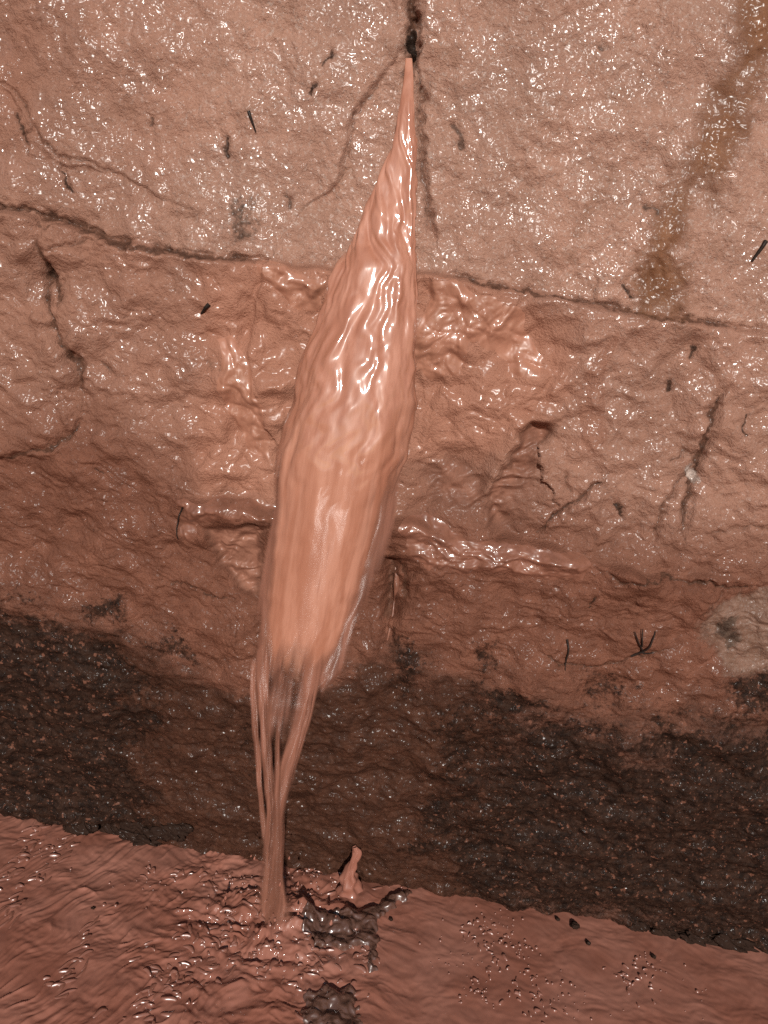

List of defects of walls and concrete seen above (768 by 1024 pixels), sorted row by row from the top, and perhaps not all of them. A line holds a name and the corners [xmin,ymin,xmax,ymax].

crack [406,0,420,63]
crack [418,88,432,217]
crack [0,205,248,384]
crack [461,276,725,325]
crack [8,425,79,459]
crack [537,477,600,532]
crack [654,397,719,529]
water stain [716,617,740,649]
water stain [0,592,297,861]
water stain [282,630,768,954]